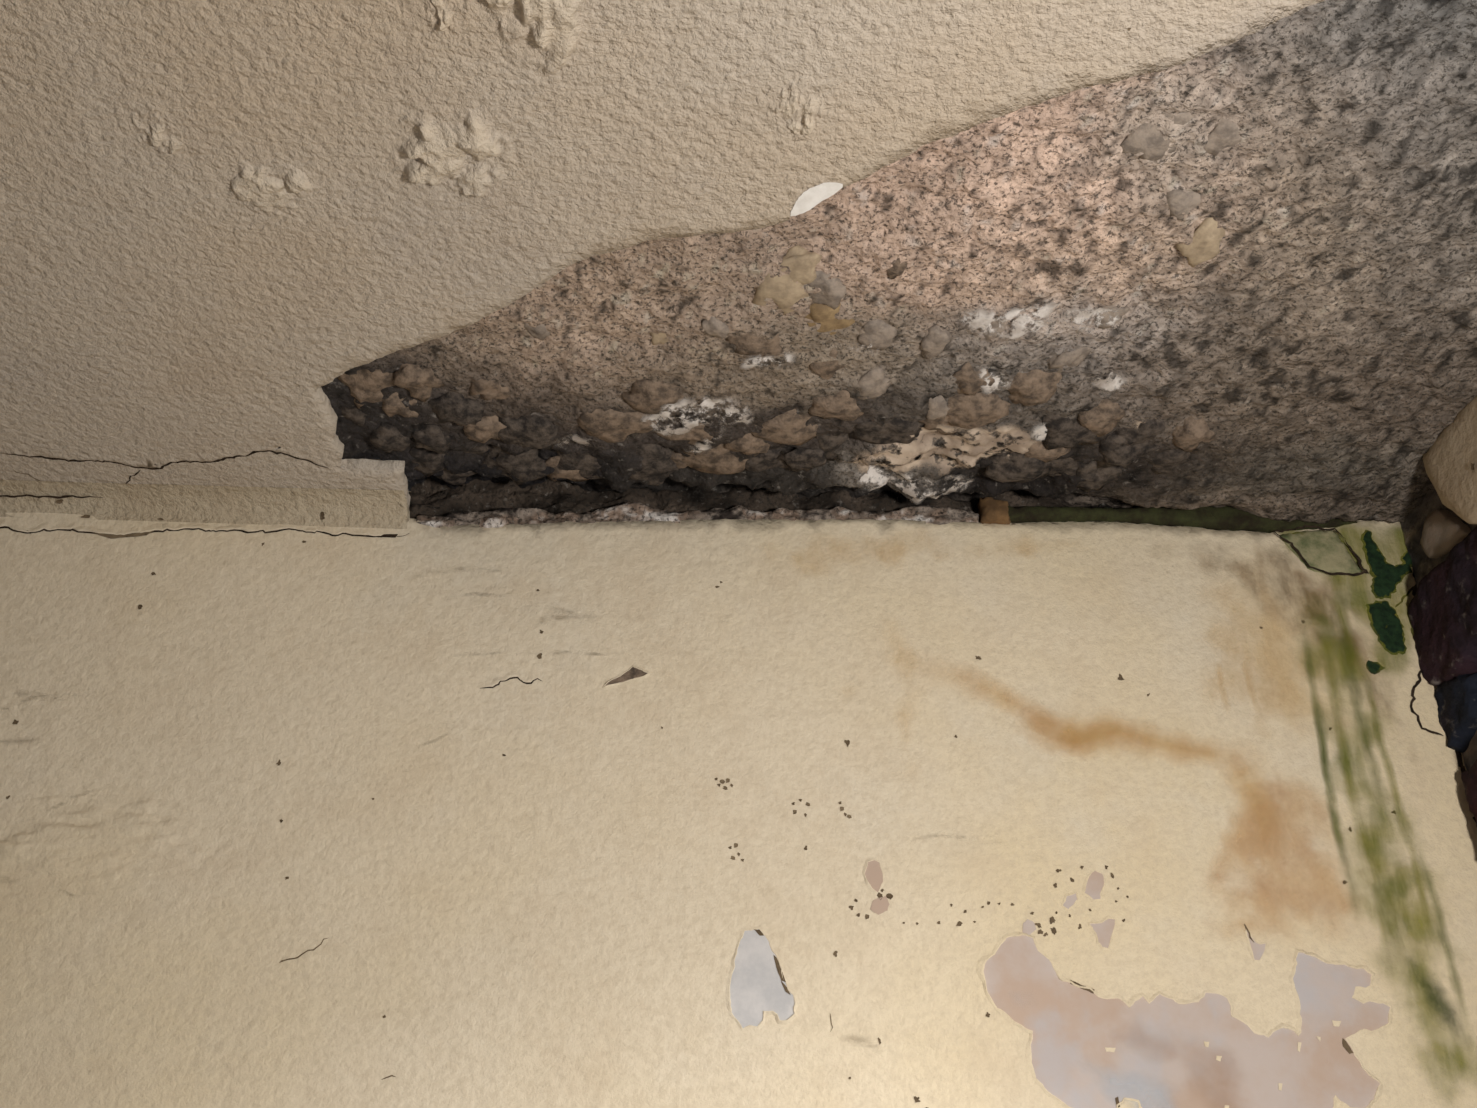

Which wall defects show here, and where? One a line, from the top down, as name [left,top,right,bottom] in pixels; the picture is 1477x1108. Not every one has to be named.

spalling [321,0,1477,574]
crack [0,443,409,539]
peeling [849,858,893,919]
peeling [726,926,800,1031]
peeling [976,865,1393,1108]